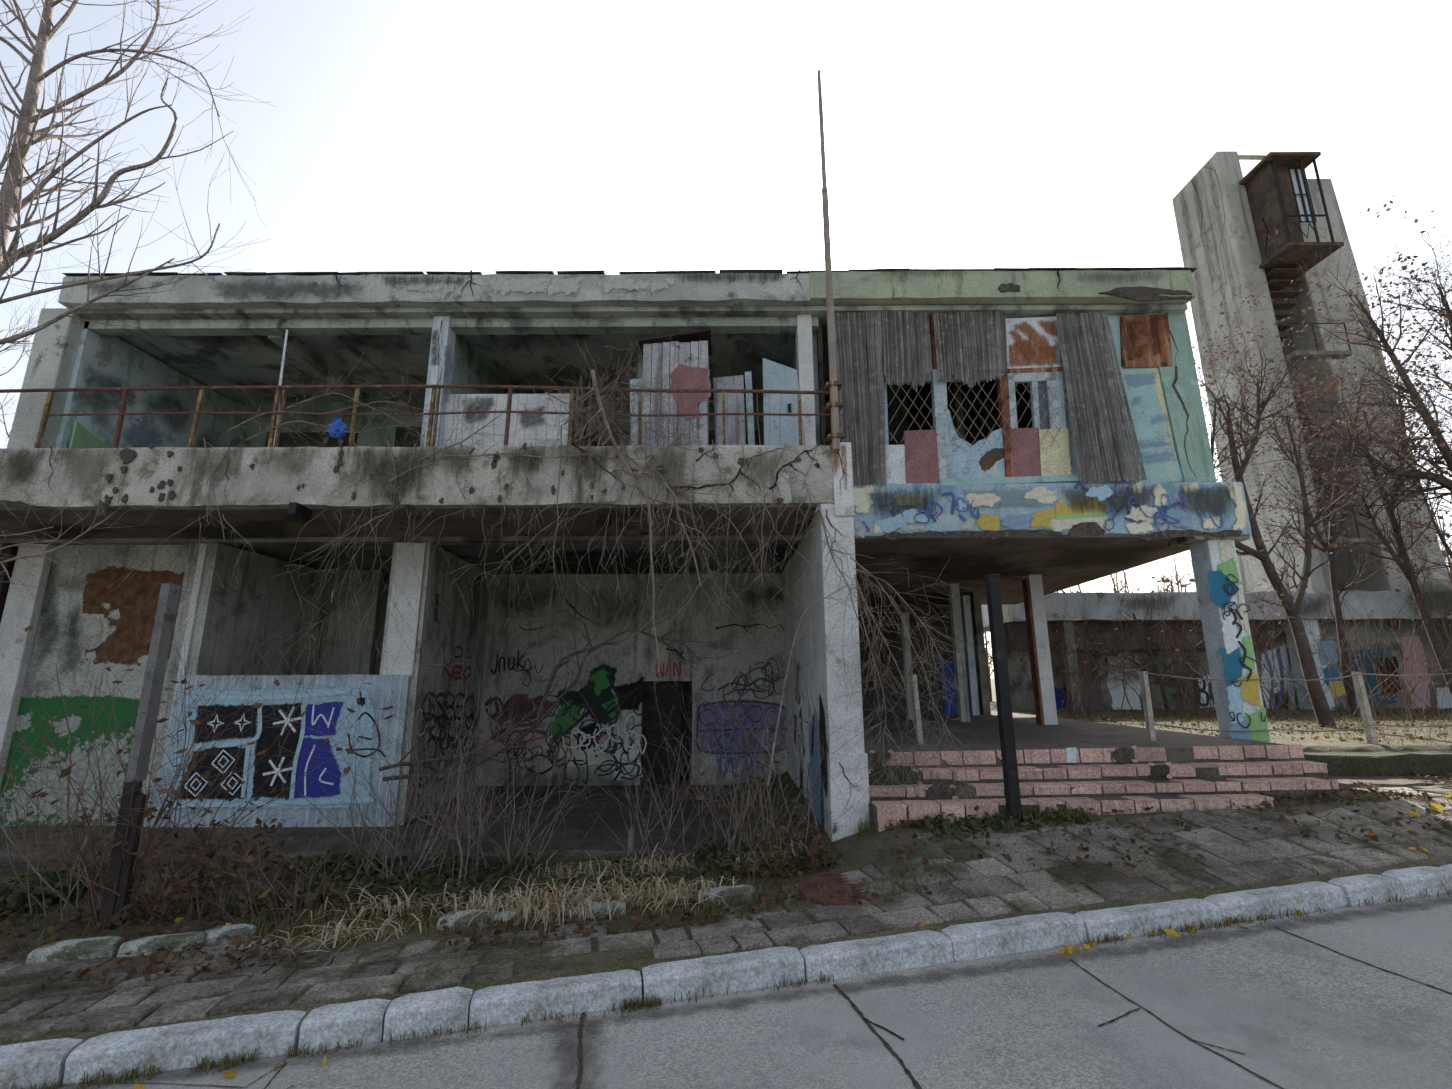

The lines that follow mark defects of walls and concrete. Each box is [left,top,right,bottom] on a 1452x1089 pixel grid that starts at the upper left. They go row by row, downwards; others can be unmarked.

leakage [219,279,353,298]
crack [1166,167,1245,477]
spalling [96,396,182,517]
spalling [82,566,185,667]